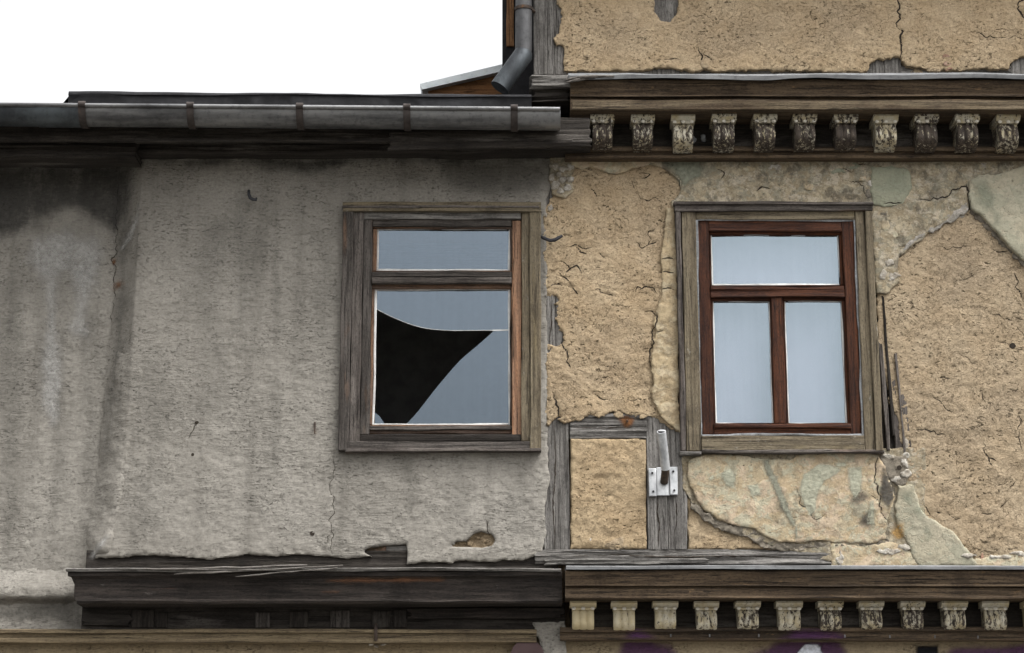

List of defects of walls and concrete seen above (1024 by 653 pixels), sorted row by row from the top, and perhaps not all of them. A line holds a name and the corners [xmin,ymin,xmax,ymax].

flaking render [554,0,1024,74]
crack [895,0,904,61]
water stain [0,168,129,231]
crack [845,163,970,204]
crack [550,230,674,370]
flaking render [543,157,1024,566]
crack [327,460,335,558]
flaking render [452,532,495,548]